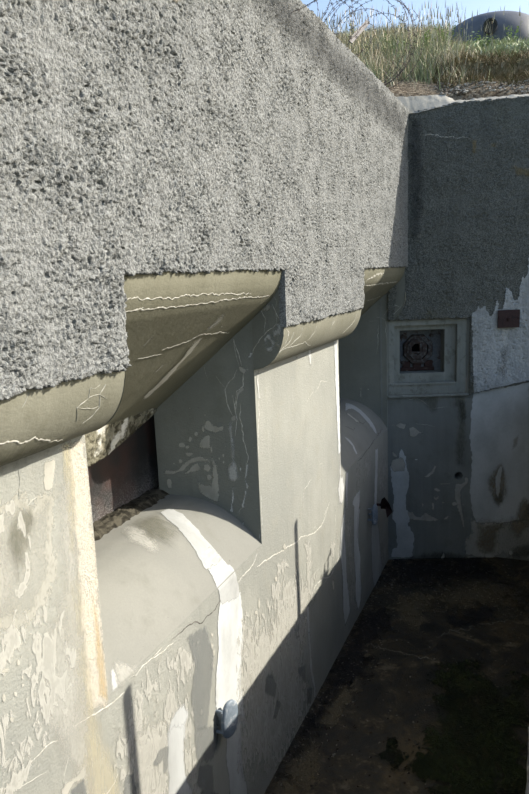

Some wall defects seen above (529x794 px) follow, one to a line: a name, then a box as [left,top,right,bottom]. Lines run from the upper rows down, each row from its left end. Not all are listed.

crack [126,292,266,312]
crack [365,270,401,347]
crack [266,318,356,367]
crack [76,384,107,422]
crack [138,331,260,465]
crack [0,436,63,445]
peeling [165,414,226,502]
leakage [411,477,529,559]
leakage [154,627,218,794]
crack [0,740,68,794]
leakage [124,775,136,794]